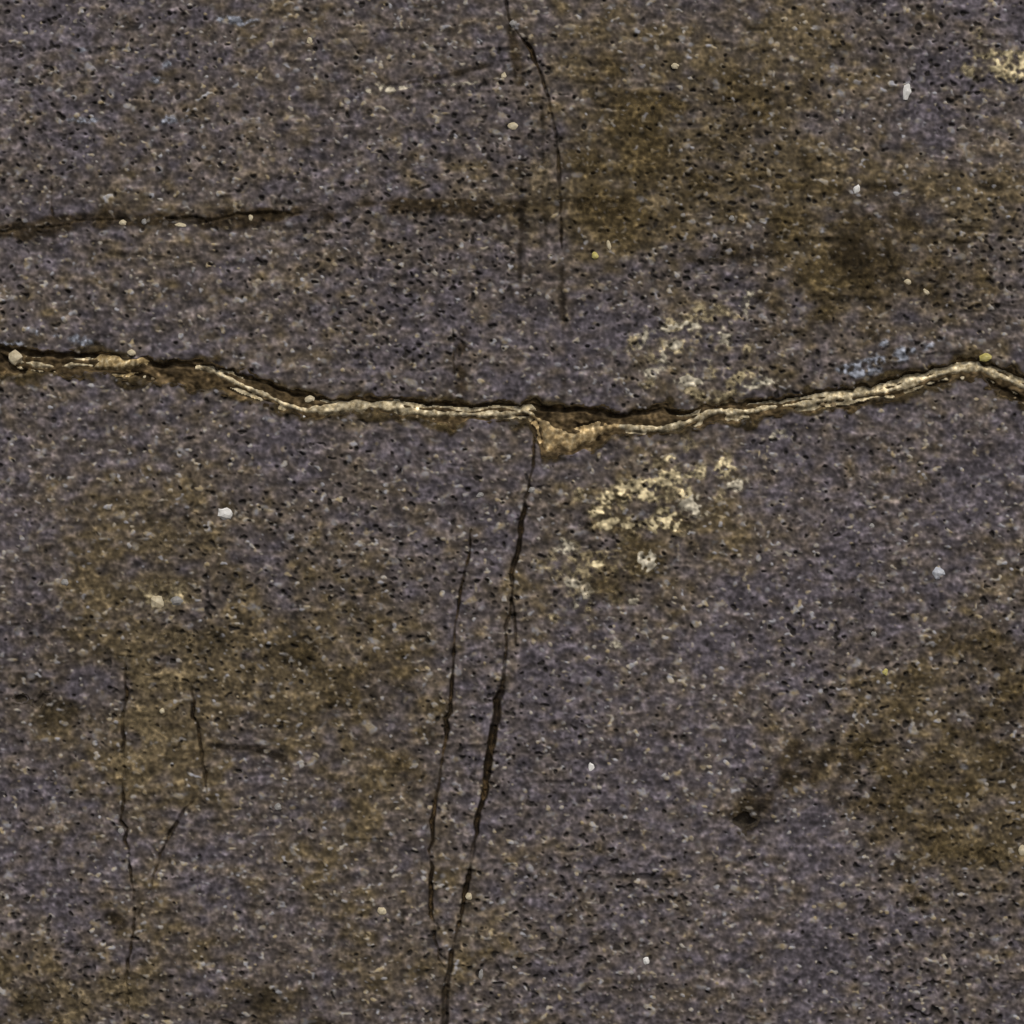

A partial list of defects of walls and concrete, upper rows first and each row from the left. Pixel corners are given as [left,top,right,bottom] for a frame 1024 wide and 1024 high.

crack [506,7,553,120]
crack [556,149,564,244]
damp [552,447,743,611]
crack [0,341,1024,996]